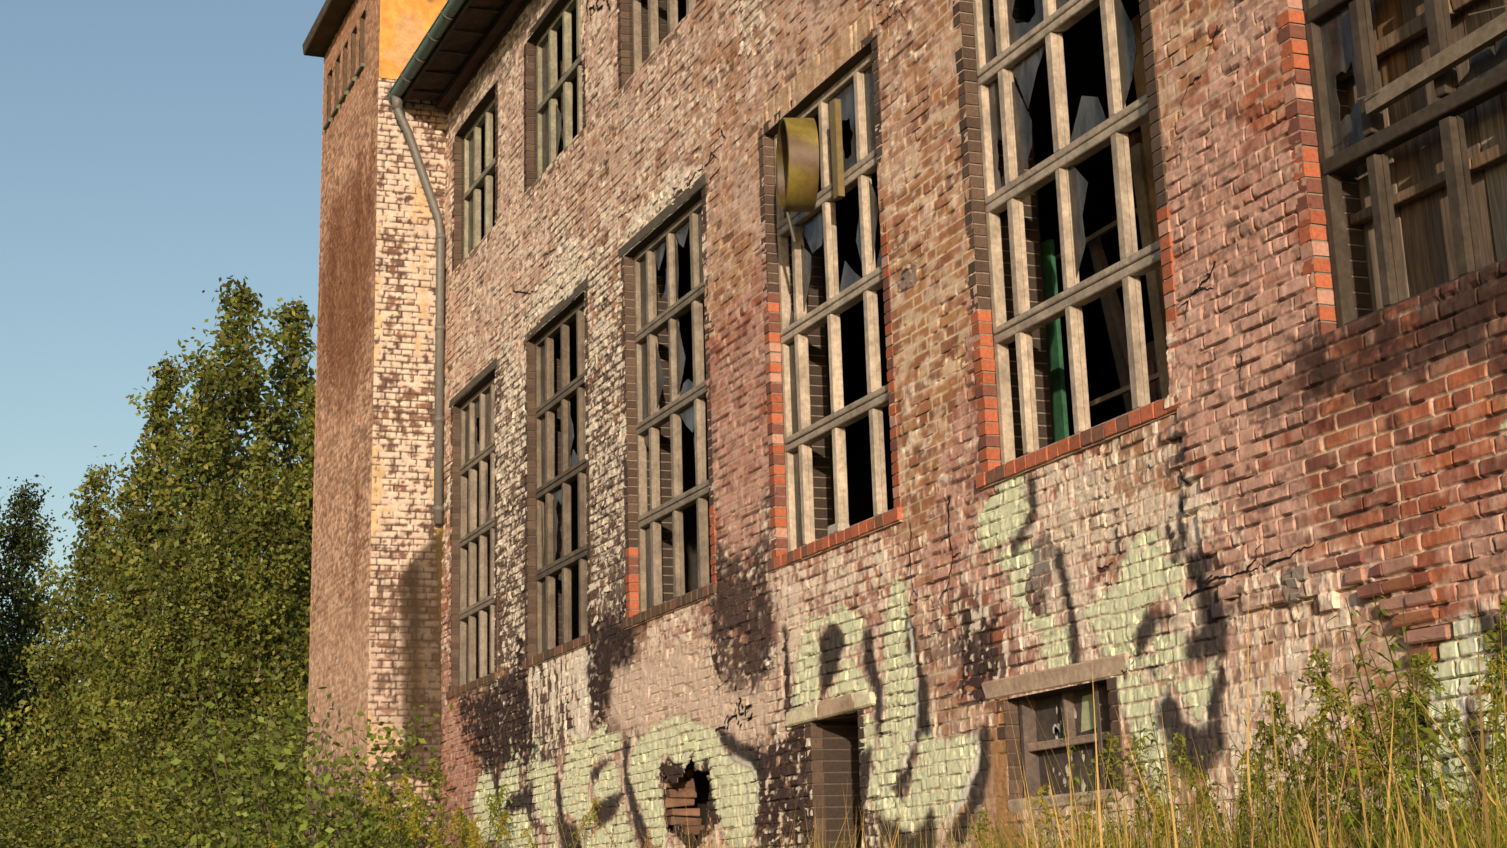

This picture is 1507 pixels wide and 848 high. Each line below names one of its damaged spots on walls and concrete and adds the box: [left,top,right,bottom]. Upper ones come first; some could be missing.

peeling [610,569,787,848]